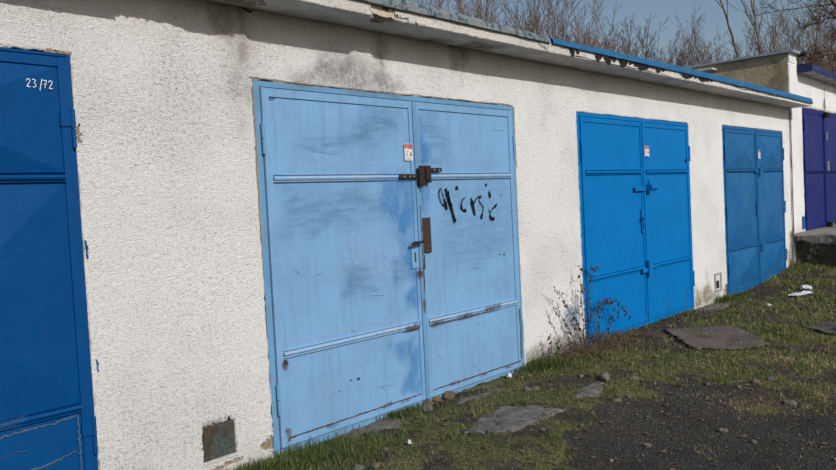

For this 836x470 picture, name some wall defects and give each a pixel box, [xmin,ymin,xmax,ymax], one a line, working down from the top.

spalling [370,5,395,21]
peeling [596,54,665,73]
rust [432,305,499,326]
rust [287,394,421,440]
peeling [0,415,82,470]
rust [203,426,229,454]